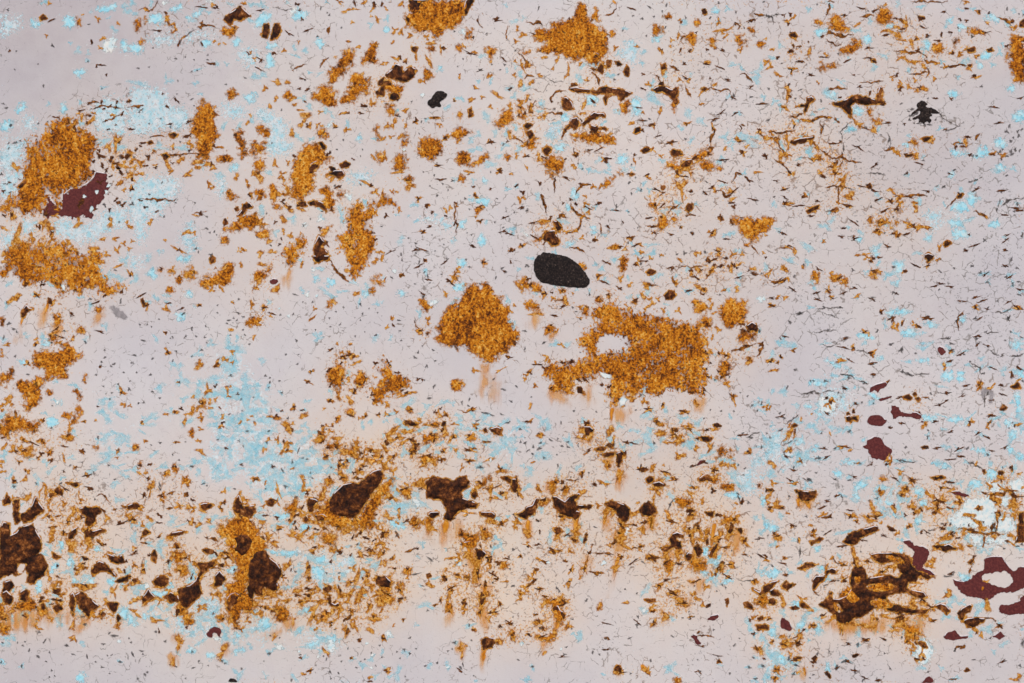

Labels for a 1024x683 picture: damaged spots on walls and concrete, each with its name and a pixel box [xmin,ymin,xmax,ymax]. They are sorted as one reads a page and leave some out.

peeling [0,82,194,280]
rust [0,0,619,341]
spalling [534,220,590,288]
crack [540,177,602,252]
crack [709,44,1023,229]
crack [826,0,966,96]
rust [110,342,523,667]
rust [415,158,790,655]
rust [751,546,952,676]
peeling [743,359,1024,683]
rust [844,455,1024,543]
crack [939,462,1024,573]